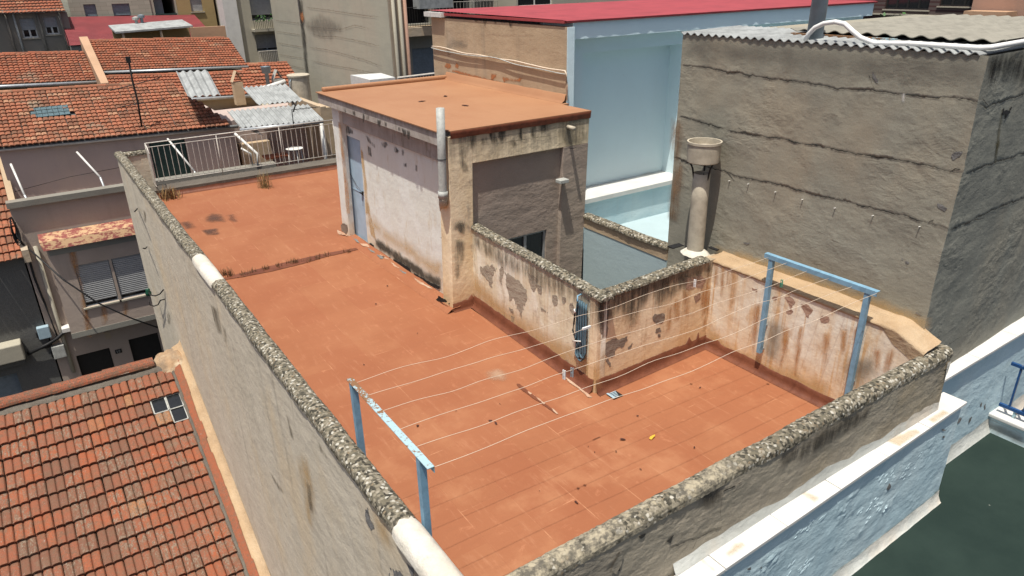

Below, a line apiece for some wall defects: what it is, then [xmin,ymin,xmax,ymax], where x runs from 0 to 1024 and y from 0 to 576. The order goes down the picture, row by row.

crack [683,59,1024,109]
crack [680,111,1024,174]
crack [674,152,1024,230]
water stain [376,241,440,286]
peeling [480,264,574,322]
peeling [598,300,633,367]
peeling [772,296,830,323]